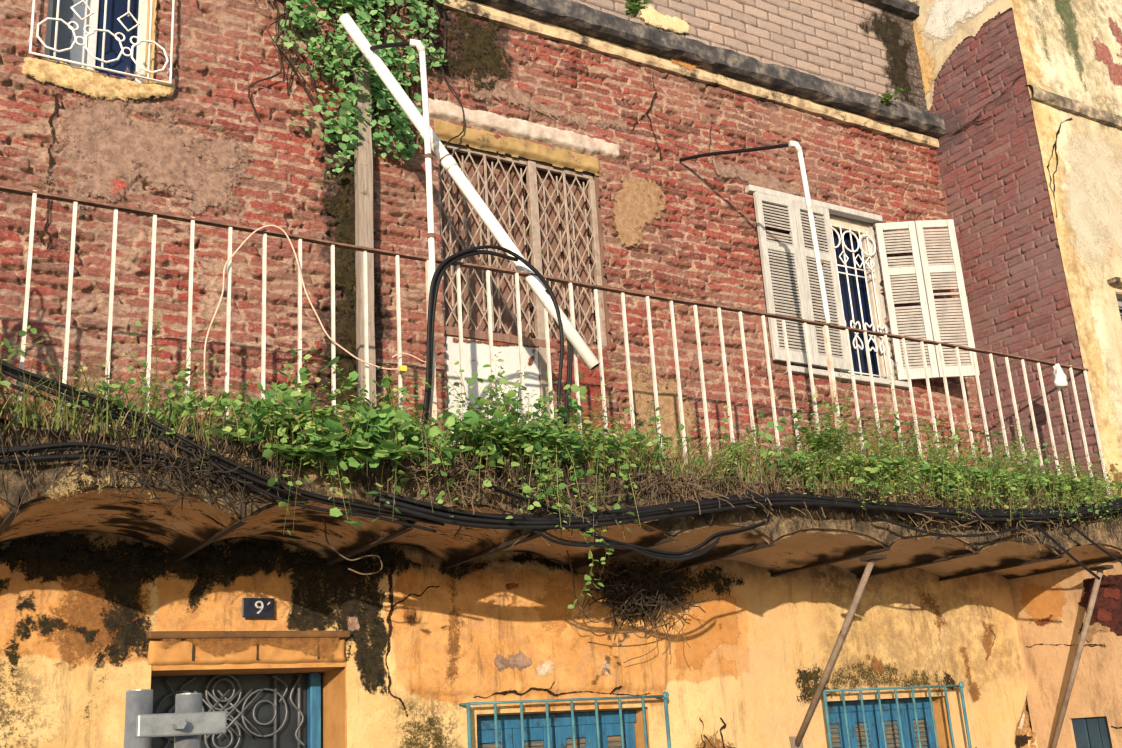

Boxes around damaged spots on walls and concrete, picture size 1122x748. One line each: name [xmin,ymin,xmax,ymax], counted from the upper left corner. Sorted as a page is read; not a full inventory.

leakage [440,9,519,93]
leakage [859,1,919,106]
leakage [1055,0,1079,49]
crack [40,93,58,249]
crack [1047,118,1073,217]
flaking render [913,8,1122,501]
leakage [0,532,353,686]
spalling [1078,574,1122,642]
crack [473,681,650,698]
spalling [1015,692,1036,748]